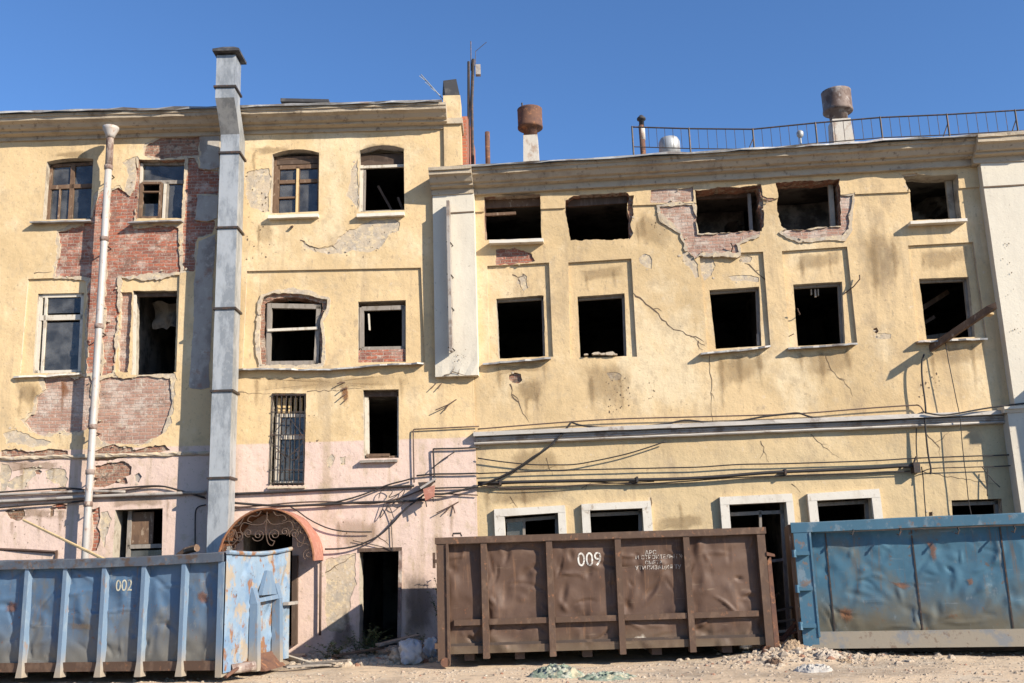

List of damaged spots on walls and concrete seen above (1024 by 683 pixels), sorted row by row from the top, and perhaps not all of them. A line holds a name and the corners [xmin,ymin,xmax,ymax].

peeling [302,218,400,258]
flaking render [495,247,535,291]
flaking render [650,185,774,283]
flaking render [779,193,855,243]
flaking render [0,137,220,551]
crack [634,294,713,422]